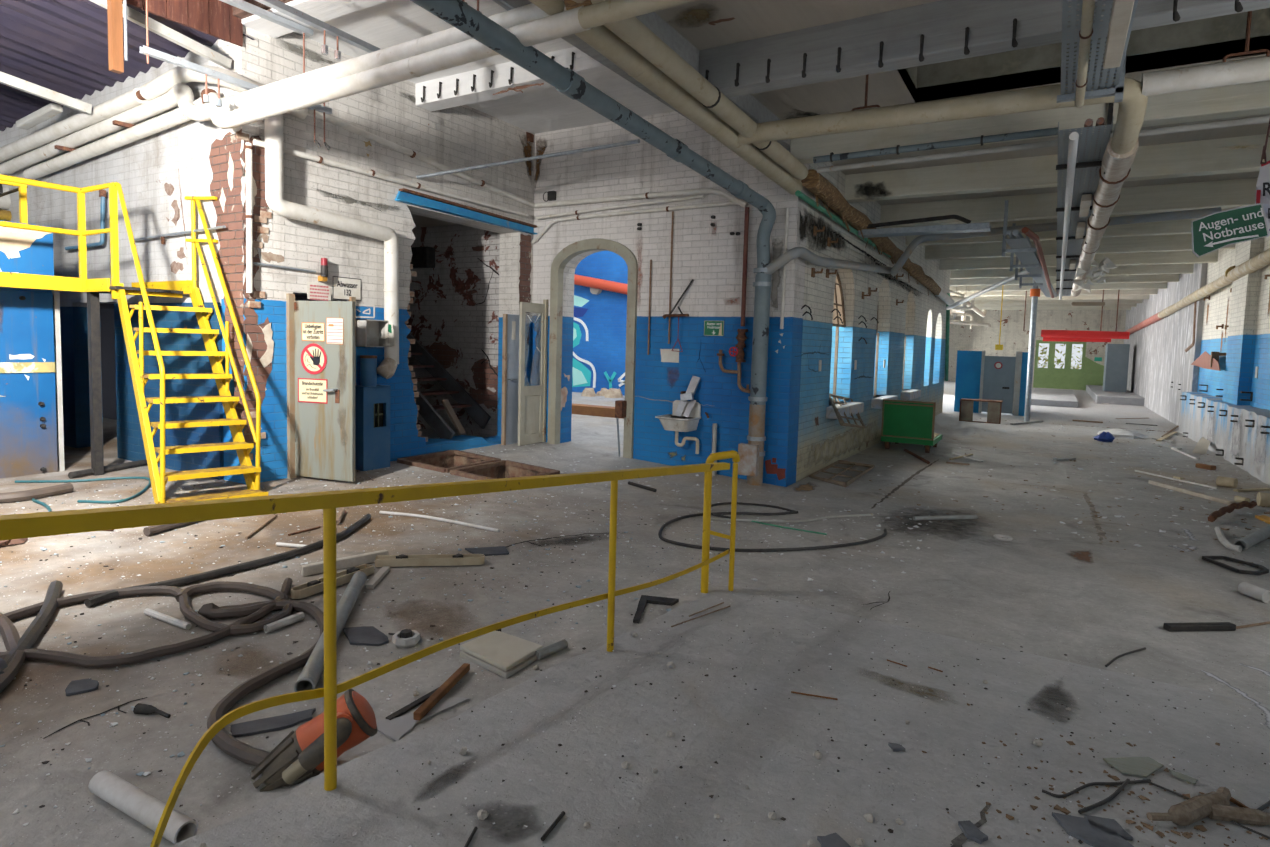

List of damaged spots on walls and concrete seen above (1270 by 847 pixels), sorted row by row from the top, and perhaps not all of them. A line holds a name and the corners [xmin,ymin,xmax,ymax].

peeling [0,226,51,273]
flaking render [209,129,284,460]
flaking render [519,234,532,304]
water stain [771,239,783,308]
water stain [799,210,845,250]
flaking render [405,271,498,442]
spalling [416,449,553,479]
crack [951,805,991,847]